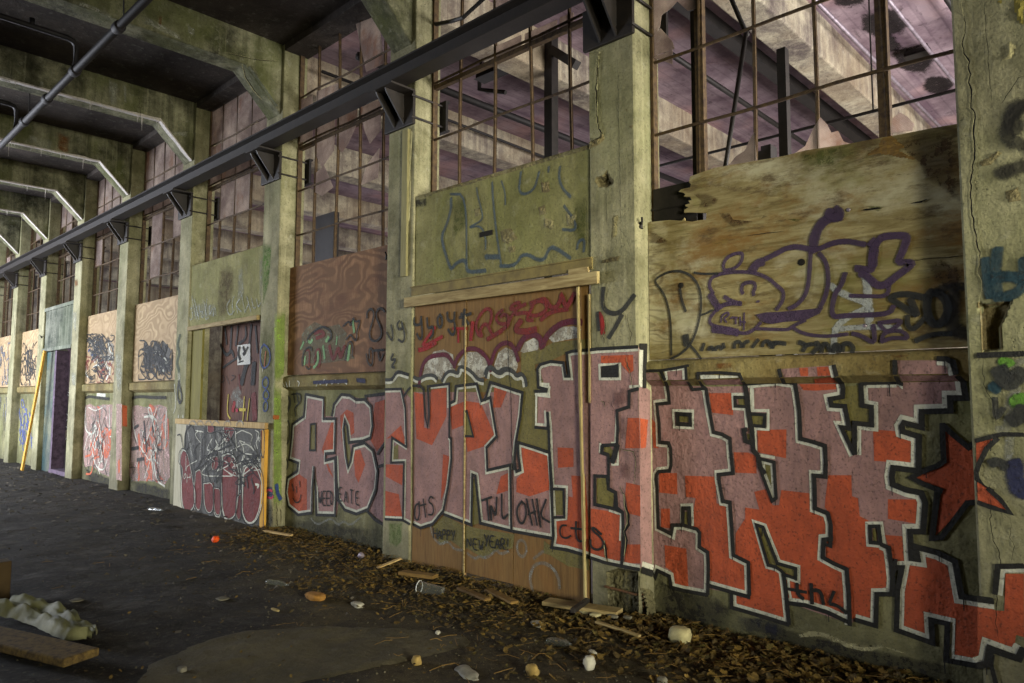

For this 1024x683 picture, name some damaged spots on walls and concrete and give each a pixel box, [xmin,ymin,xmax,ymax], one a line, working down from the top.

damp [835,0,875,36]
damp [888,8,954,94]
crack [590,52,619,146]
spalling [595,170,613,188]
crack [913,0,1023,301]
spalling [978,301,1010,352]
damp [262,314,285,525]